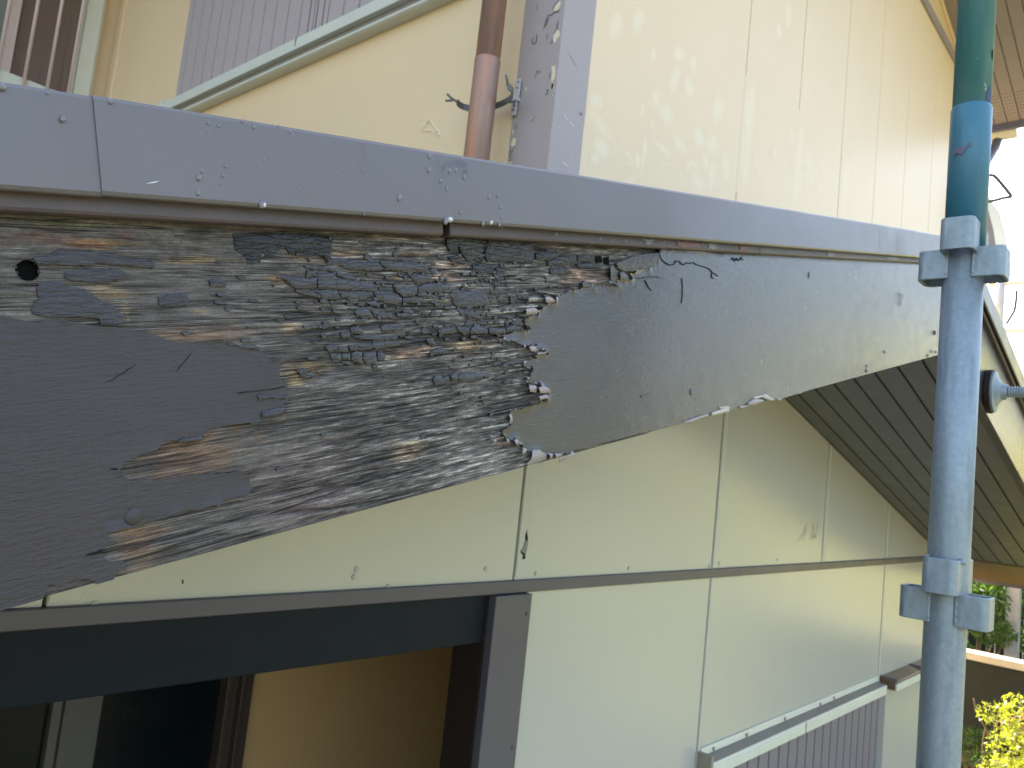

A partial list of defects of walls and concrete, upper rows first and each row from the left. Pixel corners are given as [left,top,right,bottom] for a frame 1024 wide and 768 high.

crack [639,253,743,303]
peeling [0,214,718,577]
peeling [44,579,94,597]